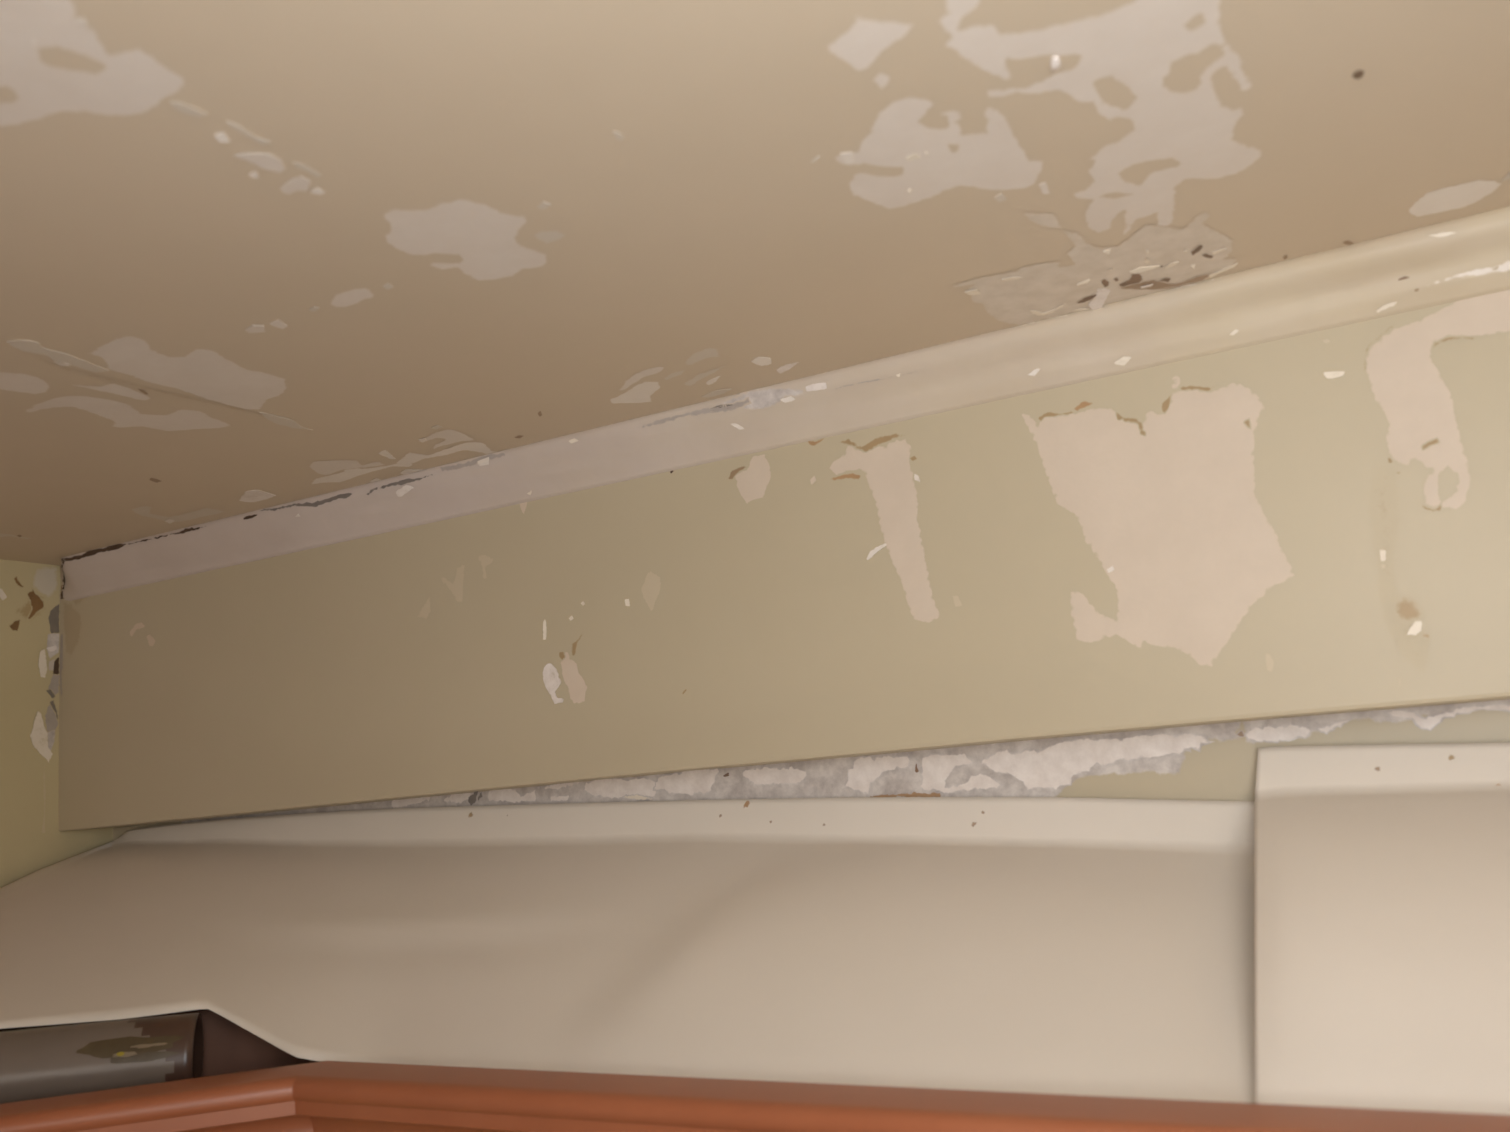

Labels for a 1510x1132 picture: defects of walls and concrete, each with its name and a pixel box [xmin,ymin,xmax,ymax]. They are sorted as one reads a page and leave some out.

peeling [0,0,207,127]
peeling [382,198,566,281]
peeling [811,0,1263,329]
peeling [1407,180,1503,217]
peeling [0,335,288,432]
peeling [1362,259,1510,512]
crack [60,526,206,601]
crack [243,451,506,520]
peeling [807,432,941,623]
peeling [1020,374,1295,667]
spalling [30,565,63,763]
spalling [180,699,1510,823]